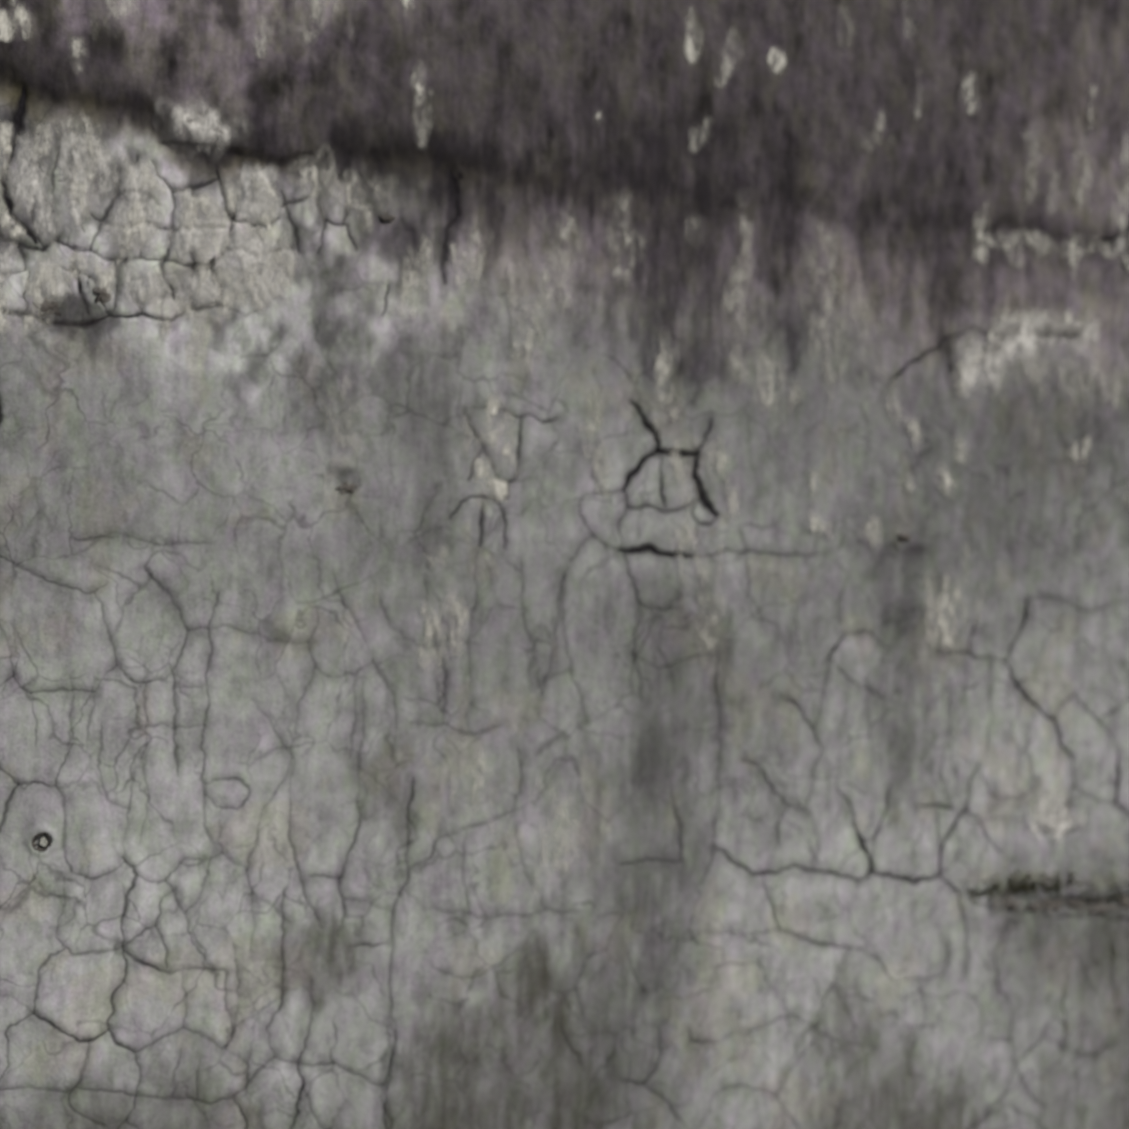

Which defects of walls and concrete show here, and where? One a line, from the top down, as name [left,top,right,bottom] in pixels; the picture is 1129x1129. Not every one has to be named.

water stain [0,0,28,42]
water stain [685,10,697,62]
water stain [768,48,786,73]
water stain [0,123,11,168]
water stain [1,212,25,238]
crack [0,87,357,327]
water stain [70,253,113,291]
crack [449,421,509,547]
crack [622,401,718,525]
crack [618,544,692,558]
crack [853,825,943,883]
crack [34,1013,135,1053]